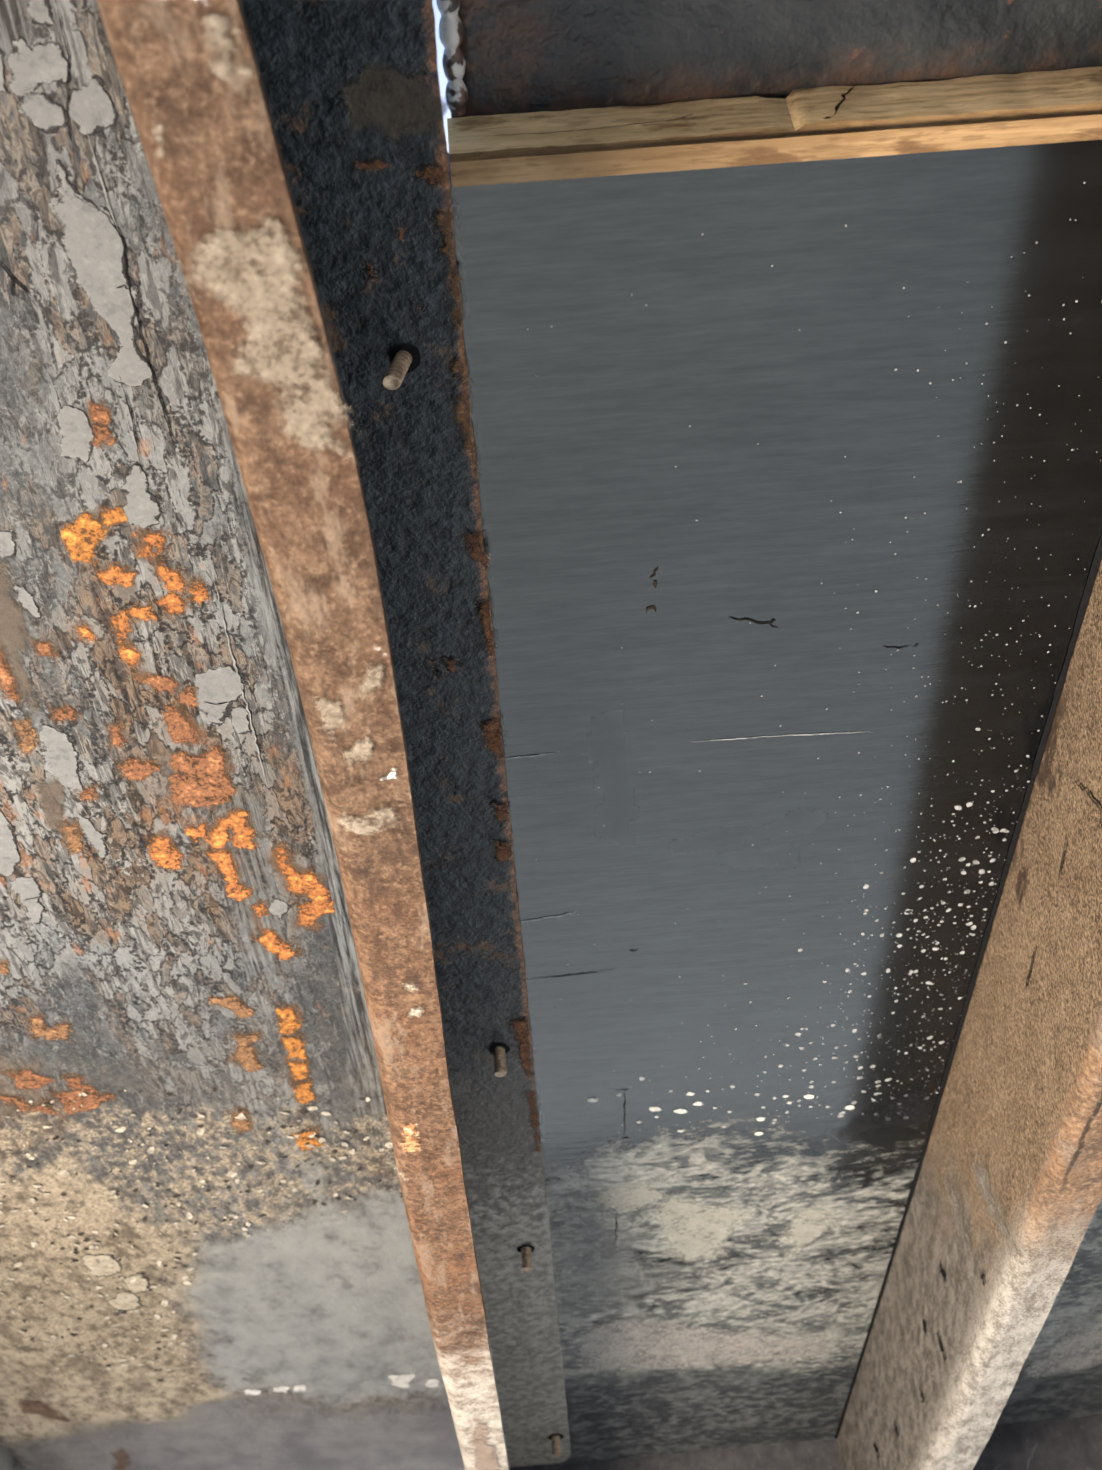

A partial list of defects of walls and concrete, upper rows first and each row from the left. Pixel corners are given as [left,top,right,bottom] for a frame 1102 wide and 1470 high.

peeling [0,0,118,138]
peeling [48,160,156,387]
corrosion [59,507,335,960]
peeling [194,666,250,735]
peeling [0,811,47,924]
corrosion [209,996,315,1104]
corrosion [292,1126,323,1151]
corrosion [508,1018,541,1152]
leakage [594,1184,751,1261]
leakage [244,1385,306,1395]
leakage [388,1374,439,1388]
leakage [569,1320,828,1372]